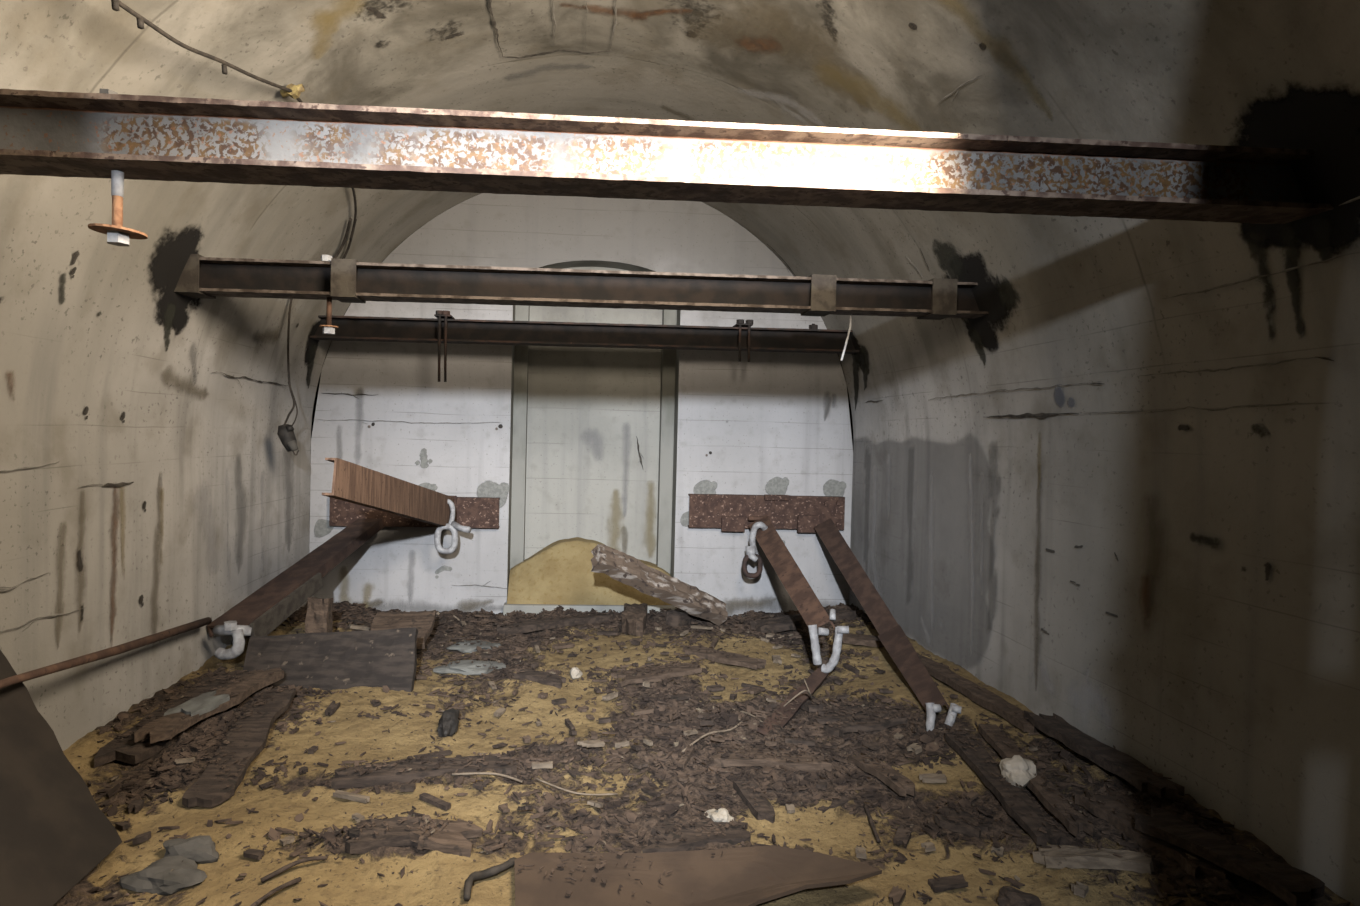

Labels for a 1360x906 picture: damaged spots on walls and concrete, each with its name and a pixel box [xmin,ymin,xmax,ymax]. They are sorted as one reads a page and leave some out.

crack [488,0,617,58]
water stain [1245,218,1333,338]
water stain [164,304,176,351]